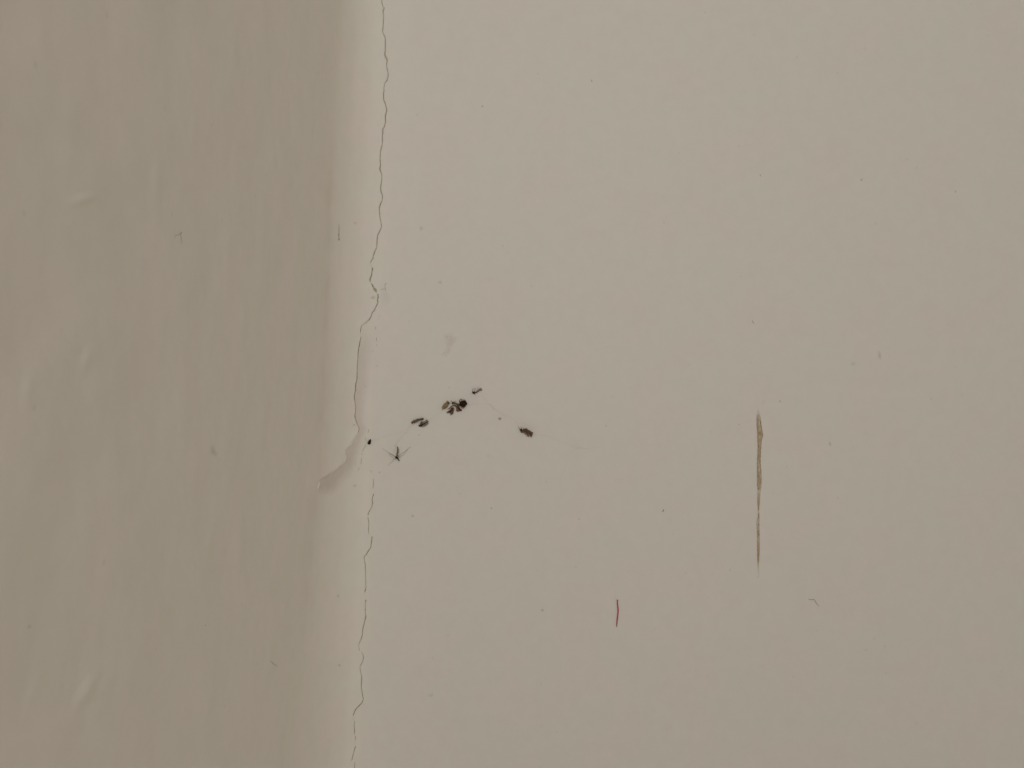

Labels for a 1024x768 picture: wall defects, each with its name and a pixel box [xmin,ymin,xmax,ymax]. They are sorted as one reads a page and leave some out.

crack [352,4,389,759]